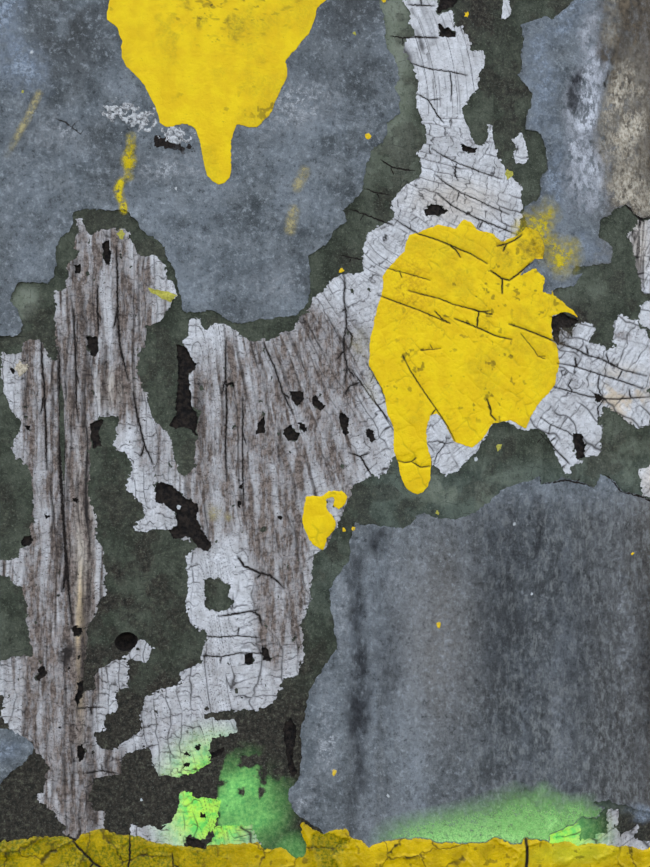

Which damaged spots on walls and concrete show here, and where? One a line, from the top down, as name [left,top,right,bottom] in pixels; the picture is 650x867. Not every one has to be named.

peeling [308,0,574,289]
crack [349,149,533,293]
crack [399,357,455,468]
crack [384,268,645,415]
peeling [0,205,650,858]
crack [73,841,101,867]